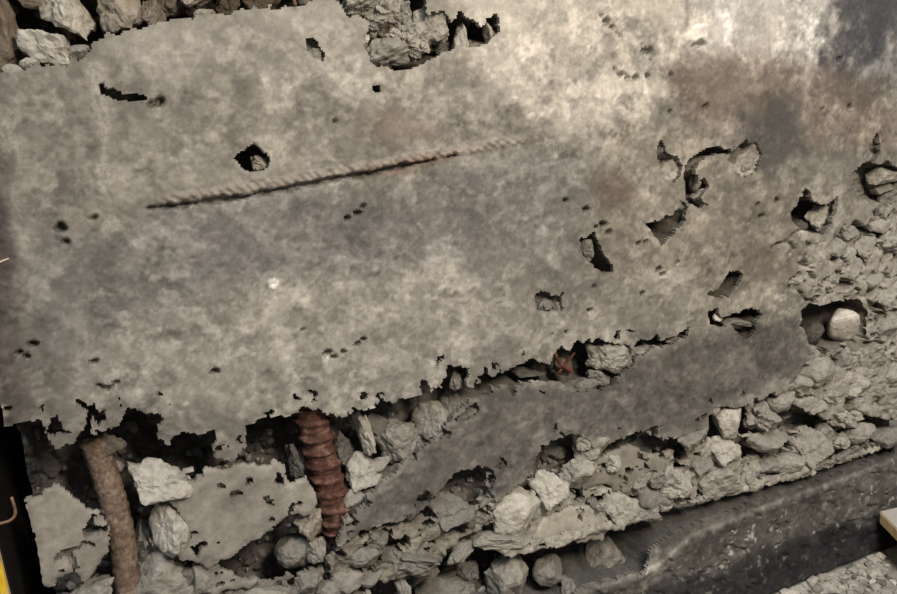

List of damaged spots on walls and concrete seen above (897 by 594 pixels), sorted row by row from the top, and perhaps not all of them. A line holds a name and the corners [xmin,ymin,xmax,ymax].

spalling [0,0,311,72]
spalling [306,38,324,61]
spalling [336,0,498,71]
leakage [818,0,897,74]
hole [790,187,835,234]
spalling [850,134,897,225]
hole [13,338,44,361]
hole [208,365,223,377]
hole [322,334,370,361]
hole [799,291,869,359]
peeling [24,399,499,594]
peeling [496,427,882,558]